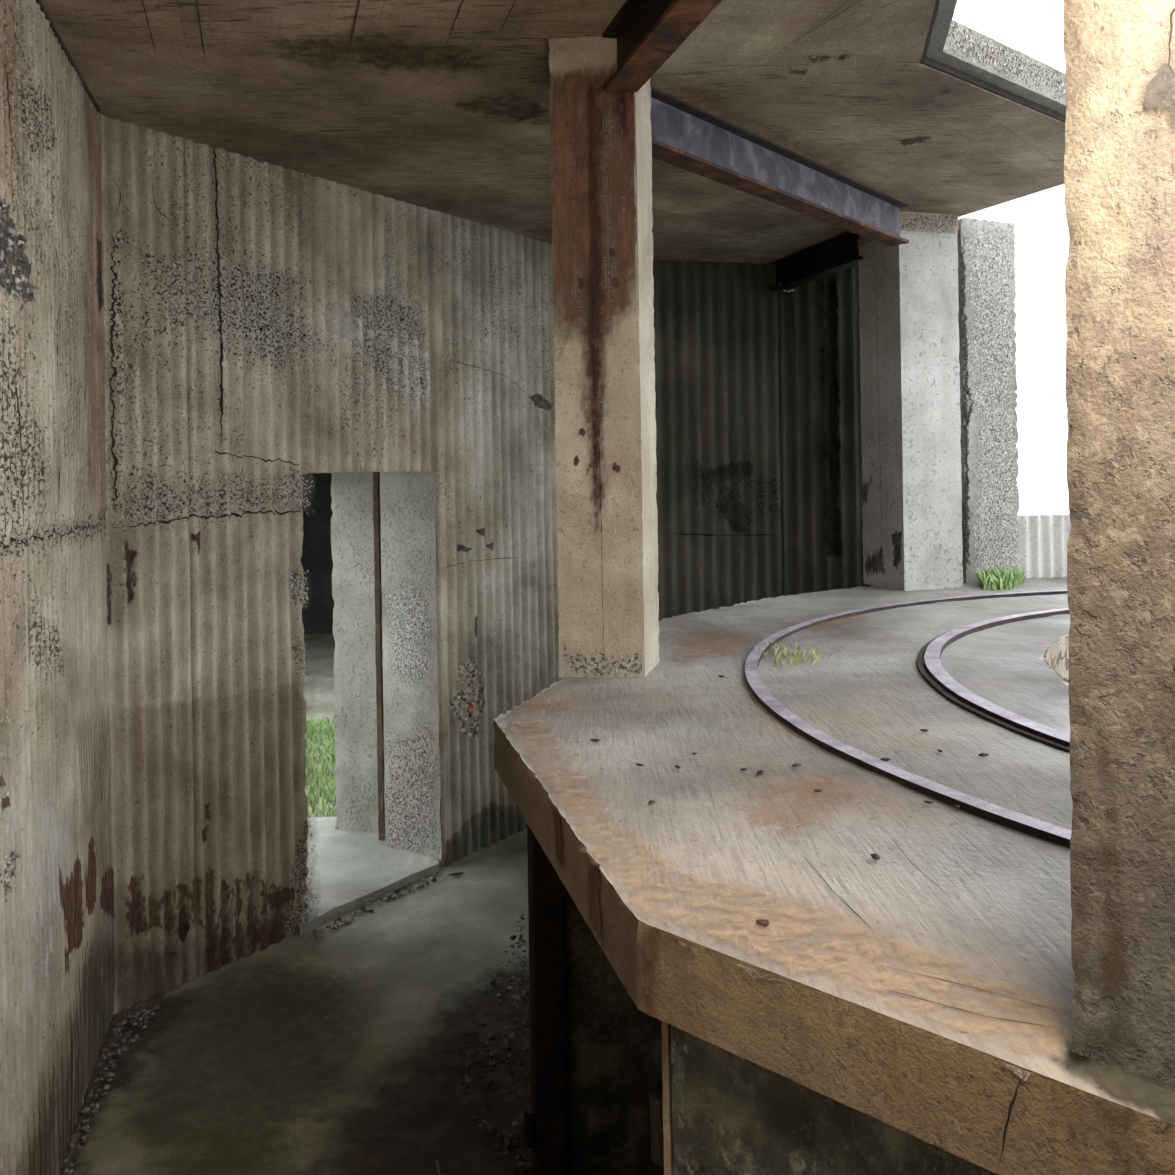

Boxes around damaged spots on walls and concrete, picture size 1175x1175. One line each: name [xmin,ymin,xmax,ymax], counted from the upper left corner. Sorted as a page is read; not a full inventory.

rust [789,54,850,75]
crack [1167,8,1175,76]
rust [901,136,931,146]
spalling [0,197,37,303]
rust [456,71,638,508]
rust [0,775,10,810]
rust [58,838,287,973]
crack [998,1075,1026,1167]